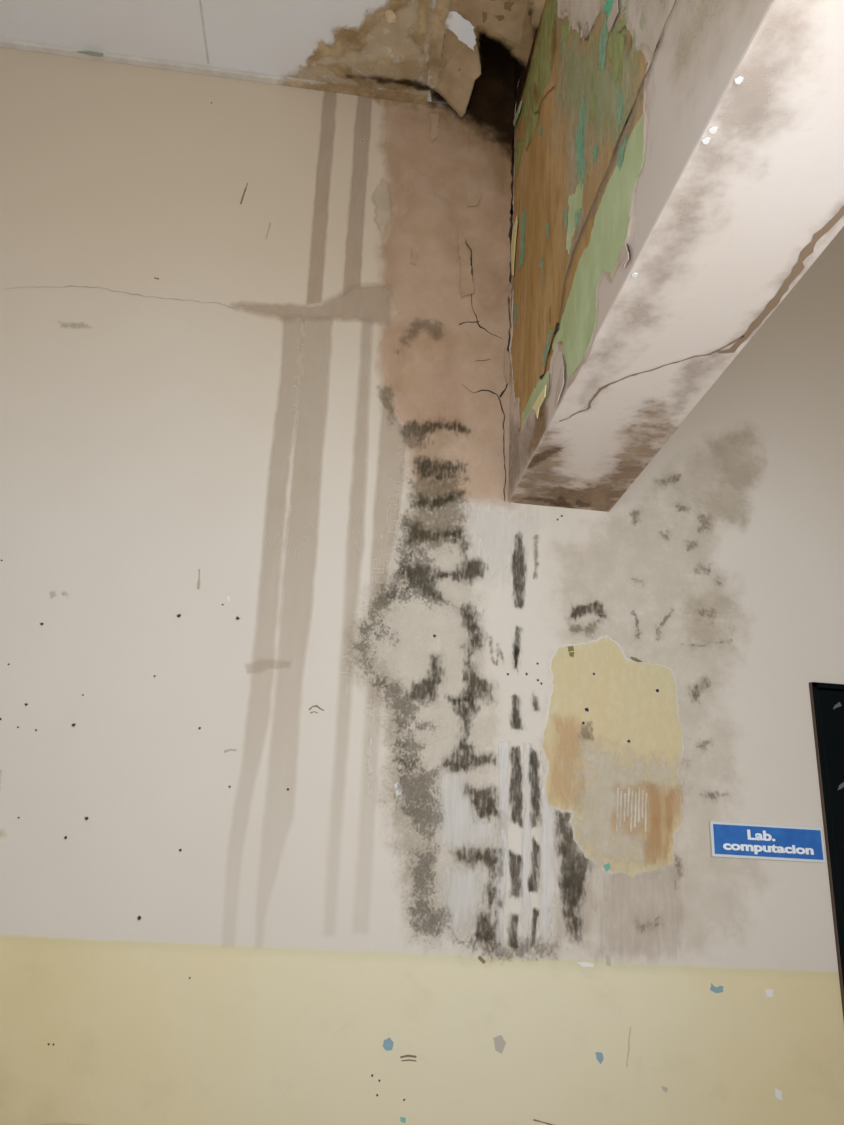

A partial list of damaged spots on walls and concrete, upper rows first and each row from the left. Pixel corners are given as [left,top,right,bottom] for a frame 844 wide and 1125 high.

crack [4,277,235,309]
damp [238,0,668,608]
peeling [504,0,654,436]
crack [540,0,676,379]
damp [406,658,441,699]
damp [442,606,589,956]
damp [571,601,605,632]
peeling [541,635,685,880]